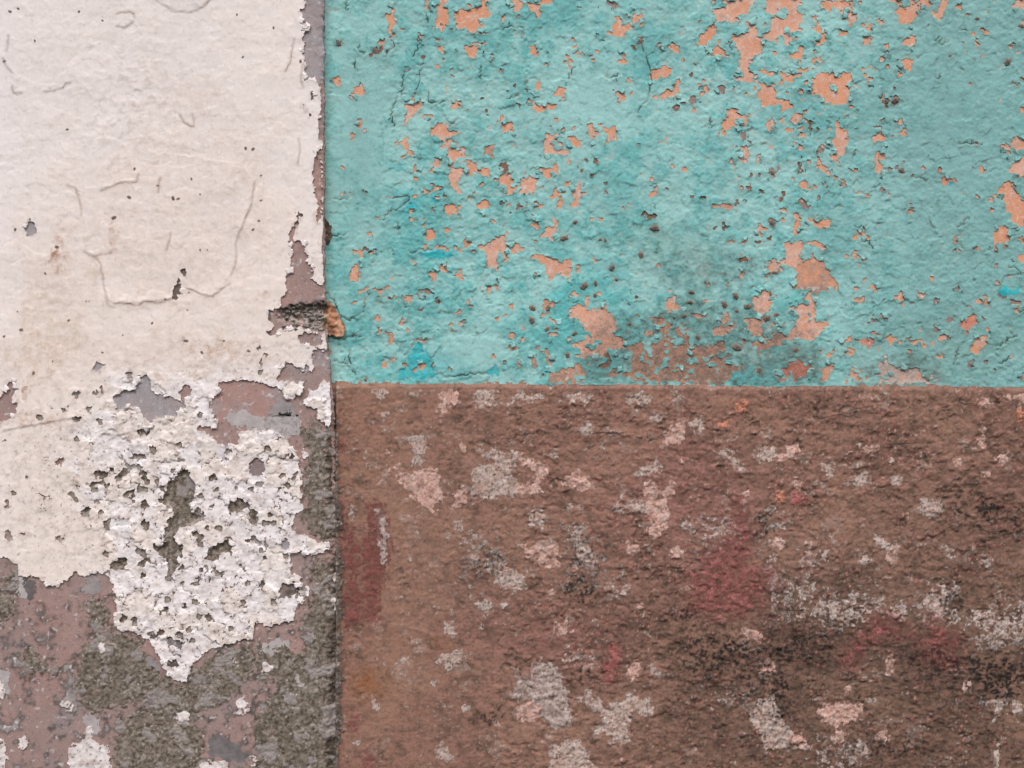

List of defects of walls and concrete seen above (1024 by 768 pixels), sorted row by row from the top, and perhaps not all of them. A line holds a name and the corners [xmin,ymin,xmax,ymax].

peeling [298,0,365,223]
peeling [349,0,1024,385]
peeling [0,212,346,768]